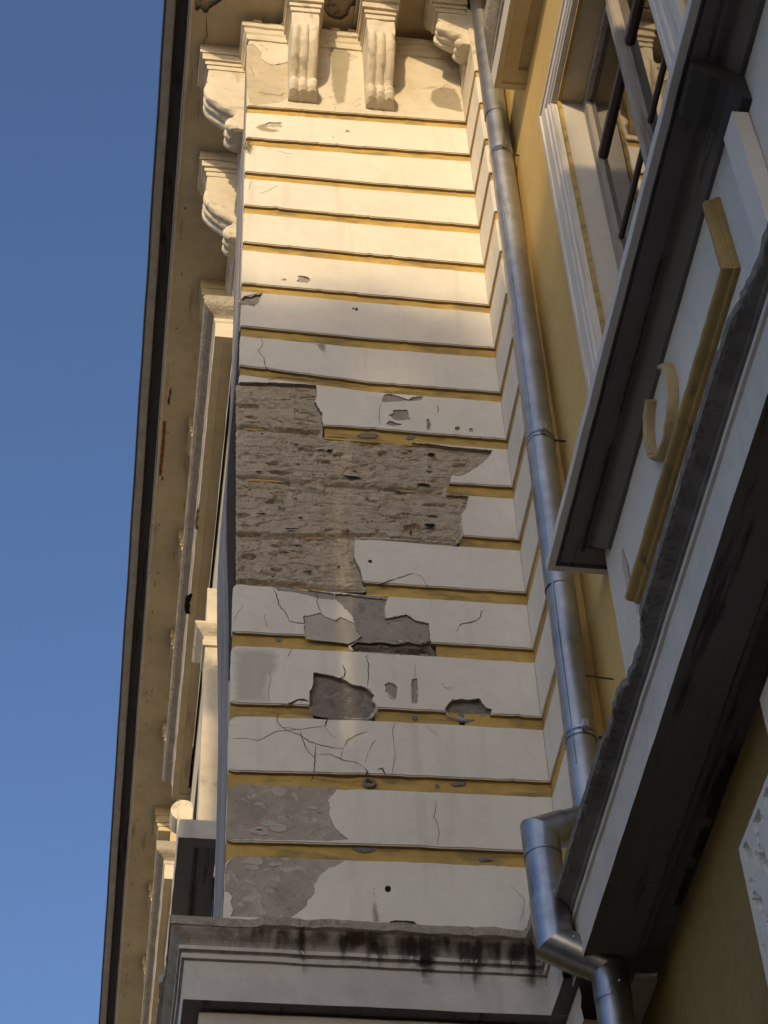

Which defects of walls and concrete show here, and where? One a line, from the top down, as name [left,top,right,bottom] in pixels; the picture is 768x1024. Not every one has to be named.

spalling [235,385,491,656]
crack [234,587,321,626]
crack [237,676,413,782]
spalling [309,676,397,721]
spalling [445,698,491,723]
peeling [226,784,375,852]
peeling [224,856,344,918]
leakage [278,928,323,954]
leakage [339,931,384,956]
leakage [399,935,536,982]